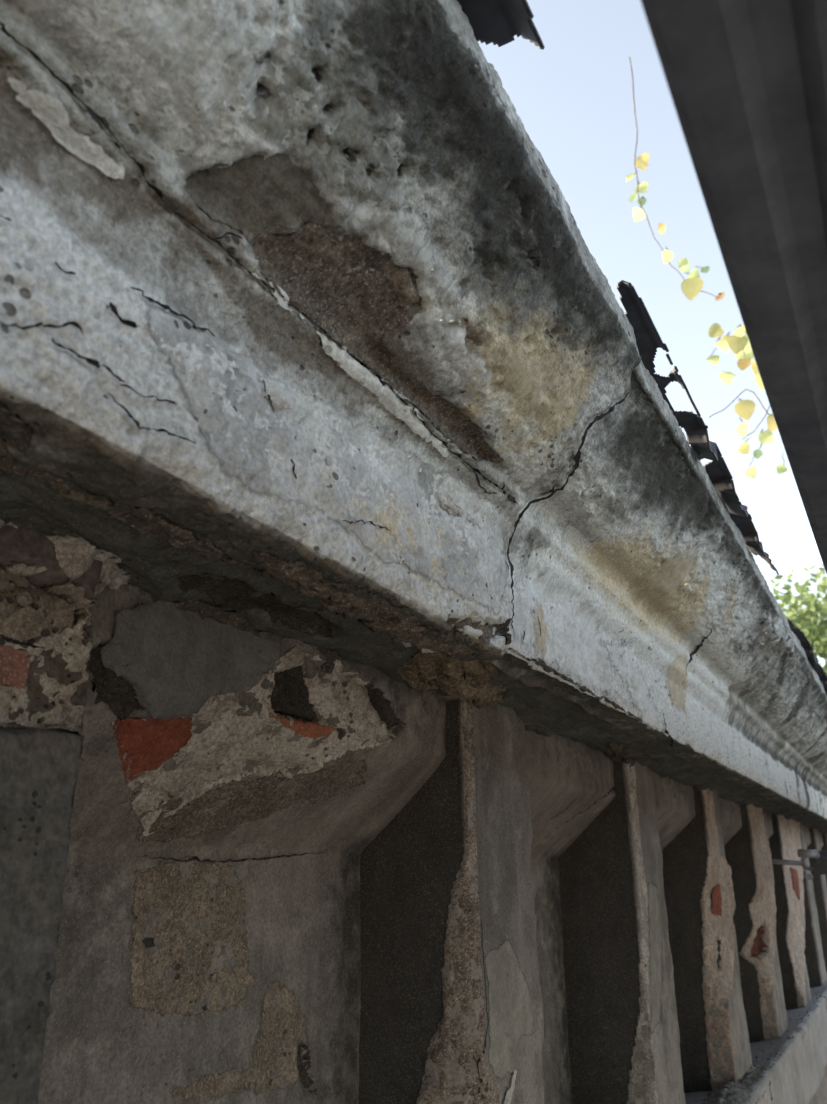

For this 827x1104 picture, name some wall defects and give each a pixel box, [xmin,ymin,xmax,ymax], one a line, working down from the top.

peeling [8,77,125,180]
crack [0,22,629,640]
spalling [184,51,504,464]
damp [439,312,491,379]
flaking render [0,533,406,844]
flaking render [147,307,535,1104]
crack [663,713,674,746]
flaking render [701,789,805,1090]